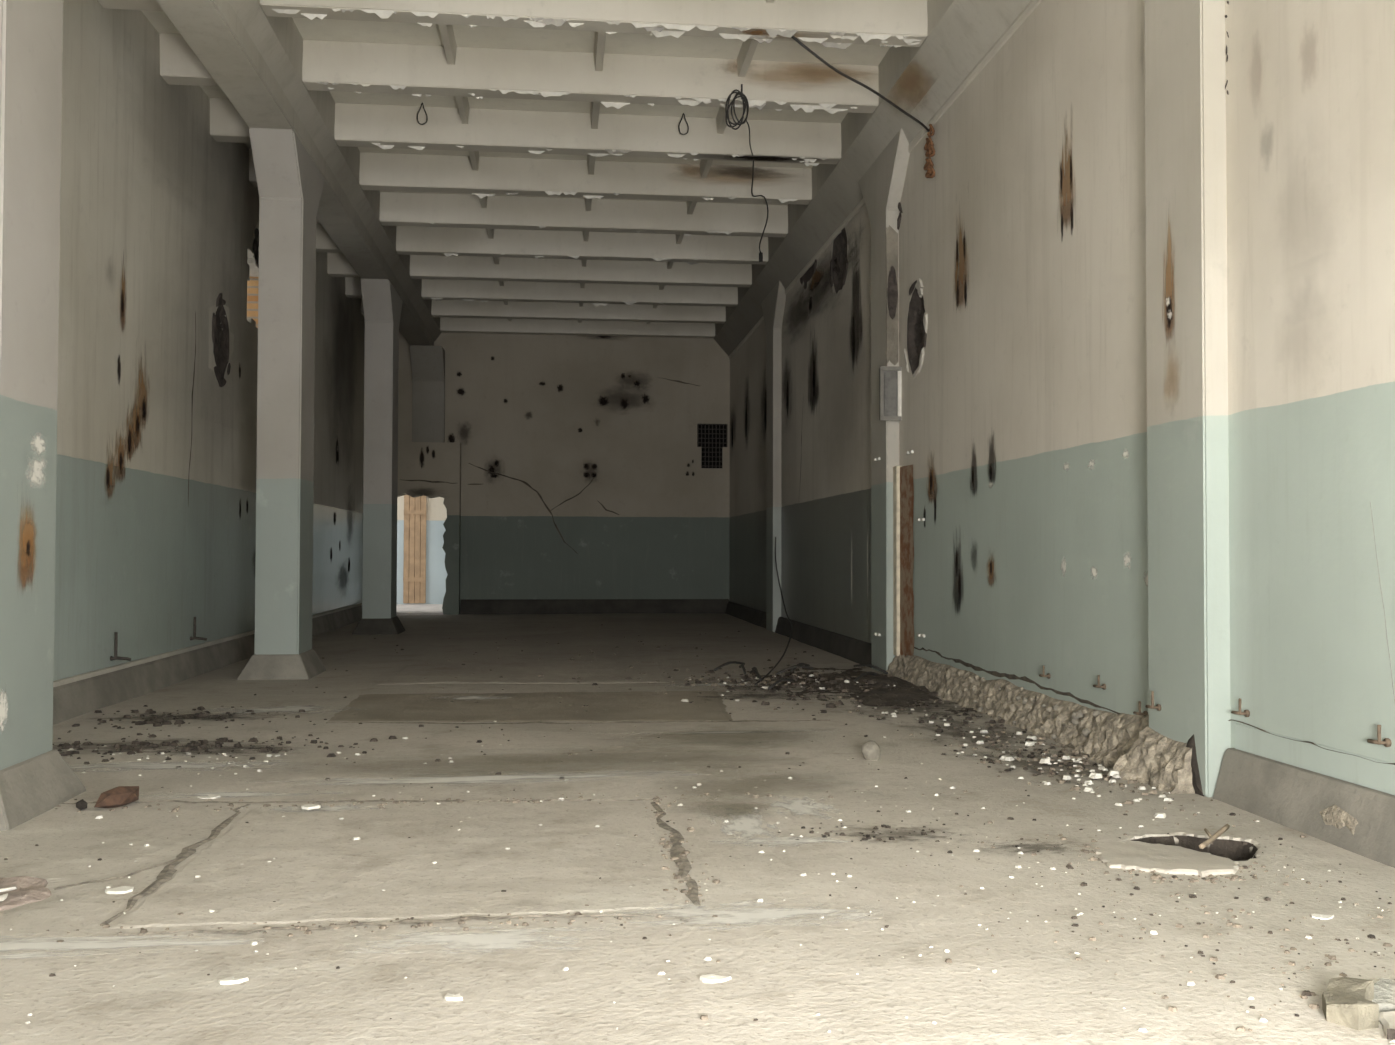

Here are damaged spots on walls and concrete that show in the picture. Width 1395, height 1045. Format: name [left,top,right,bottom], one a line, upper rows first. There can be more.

corrosion [1060,136,1073,237]
spalling [212,293,231,387]
spalling [886,202,928,379]
corrosion [955,226,967,307]
corrosion [1164,220,1174,336]
corrosion [106,365,147,497]
corrosion [19,512,34,588]
crack [53,798,703,936]
spalling [1132,835,1258,861]